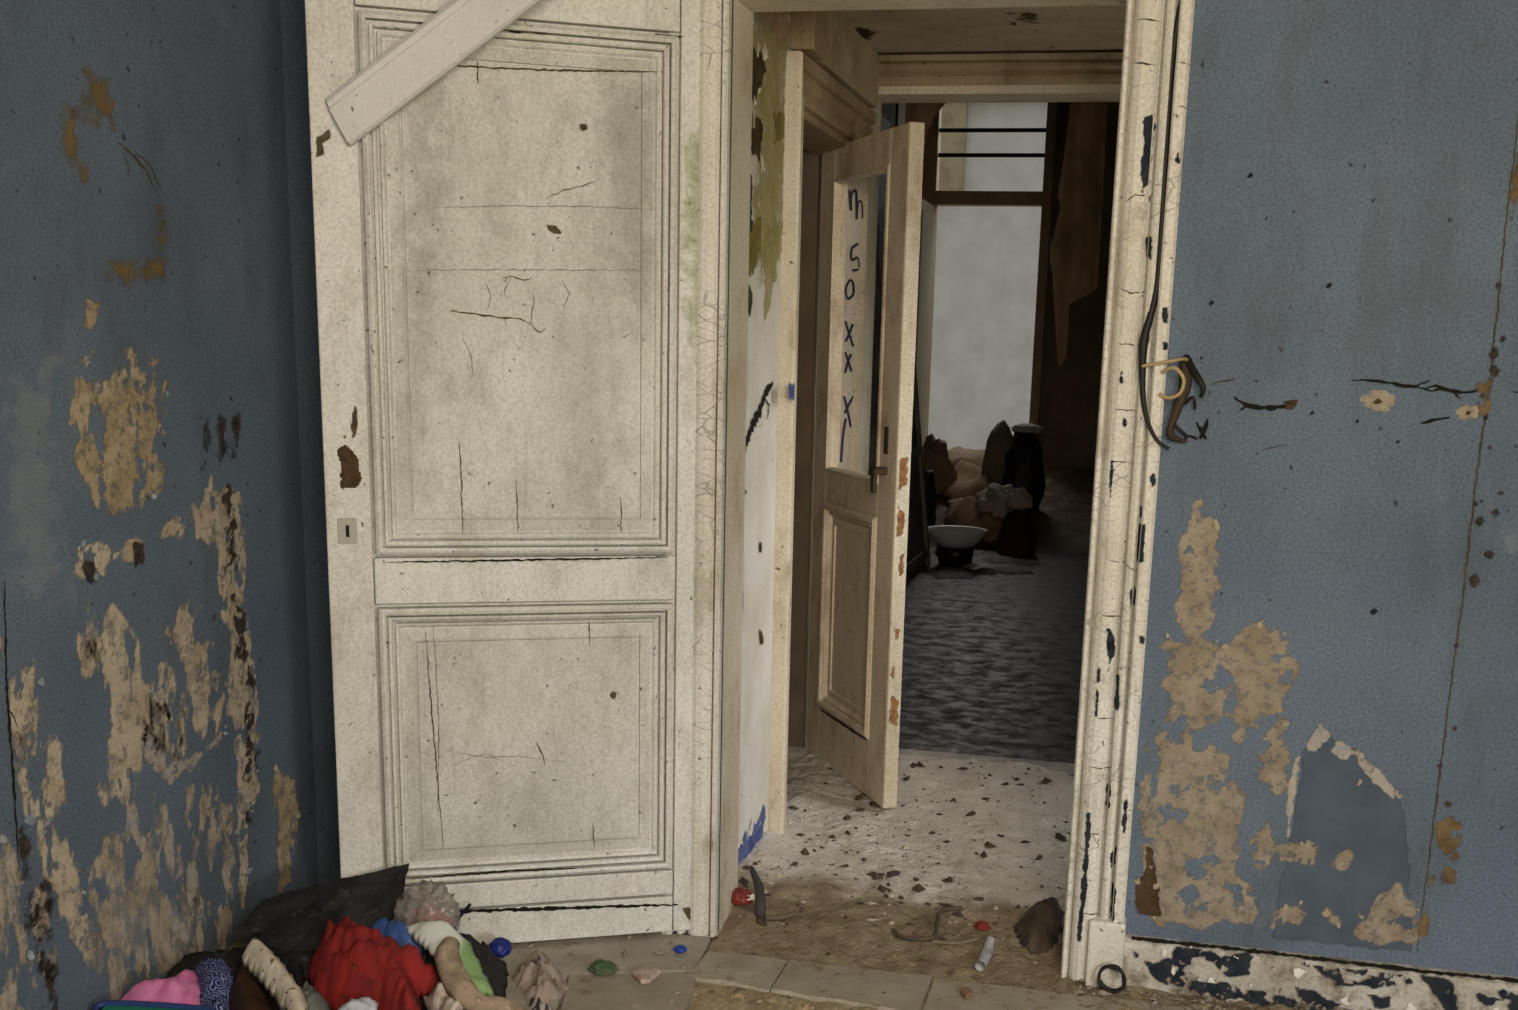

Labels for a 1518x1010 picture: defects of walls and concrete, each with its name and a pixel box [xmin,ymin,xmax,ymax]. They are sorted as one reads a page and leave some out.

flaking render [750,43,768,231]
peeling [68,348,170,515]
flaking render [1359,390,1395,412]
crack [1352,117,1518,952]
peeling [0,475,301,1010]
peeling [1095,628,1120,717]
peeling [1105,498,1458,1010]
peeling [1077,813,1091,942]
peeling [1477,989,1518,1010]